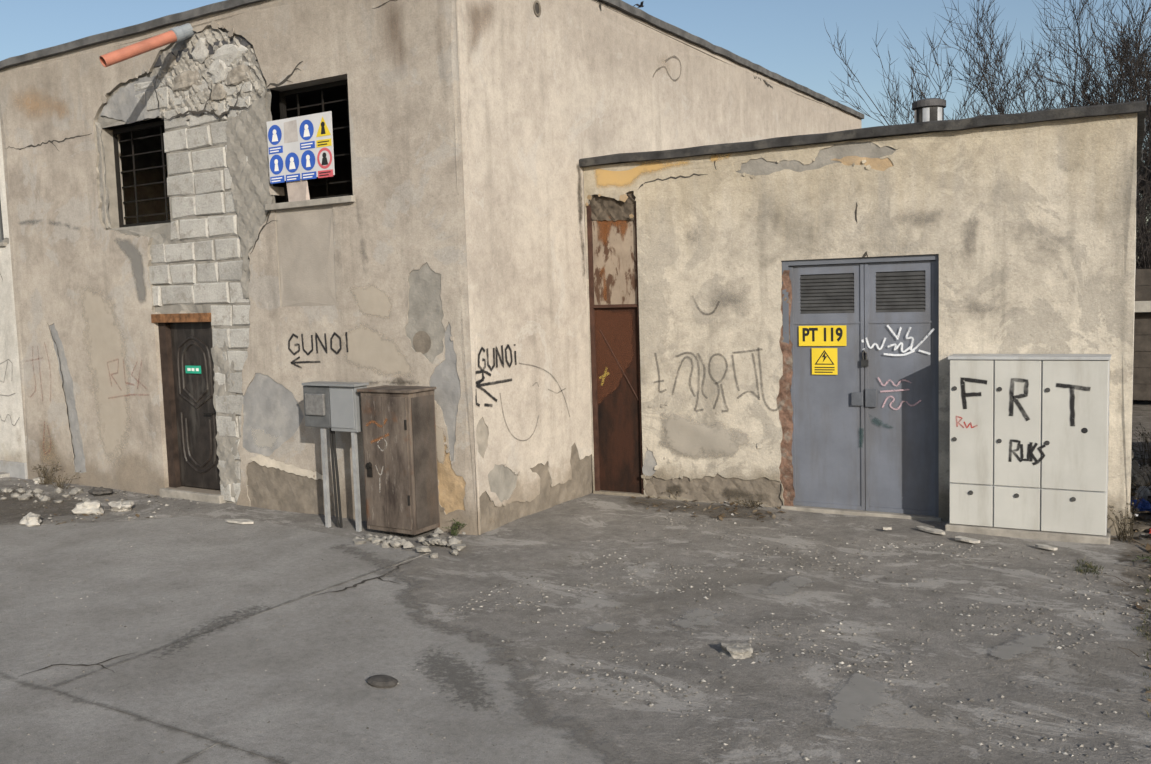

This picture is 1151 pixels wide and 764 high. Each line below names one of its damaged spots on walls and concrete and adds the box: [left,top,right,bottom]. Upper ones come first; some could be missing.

crack [10,134,90,152]
peeling [736,142,898,178]
spalling [95,20,336,516]
corrosion [597,216,628,244]
corrosion [595,267,634,404]
peeling [405,263,466,514]
peeling [476,418,489,458]
peeling [479,443,593,534]